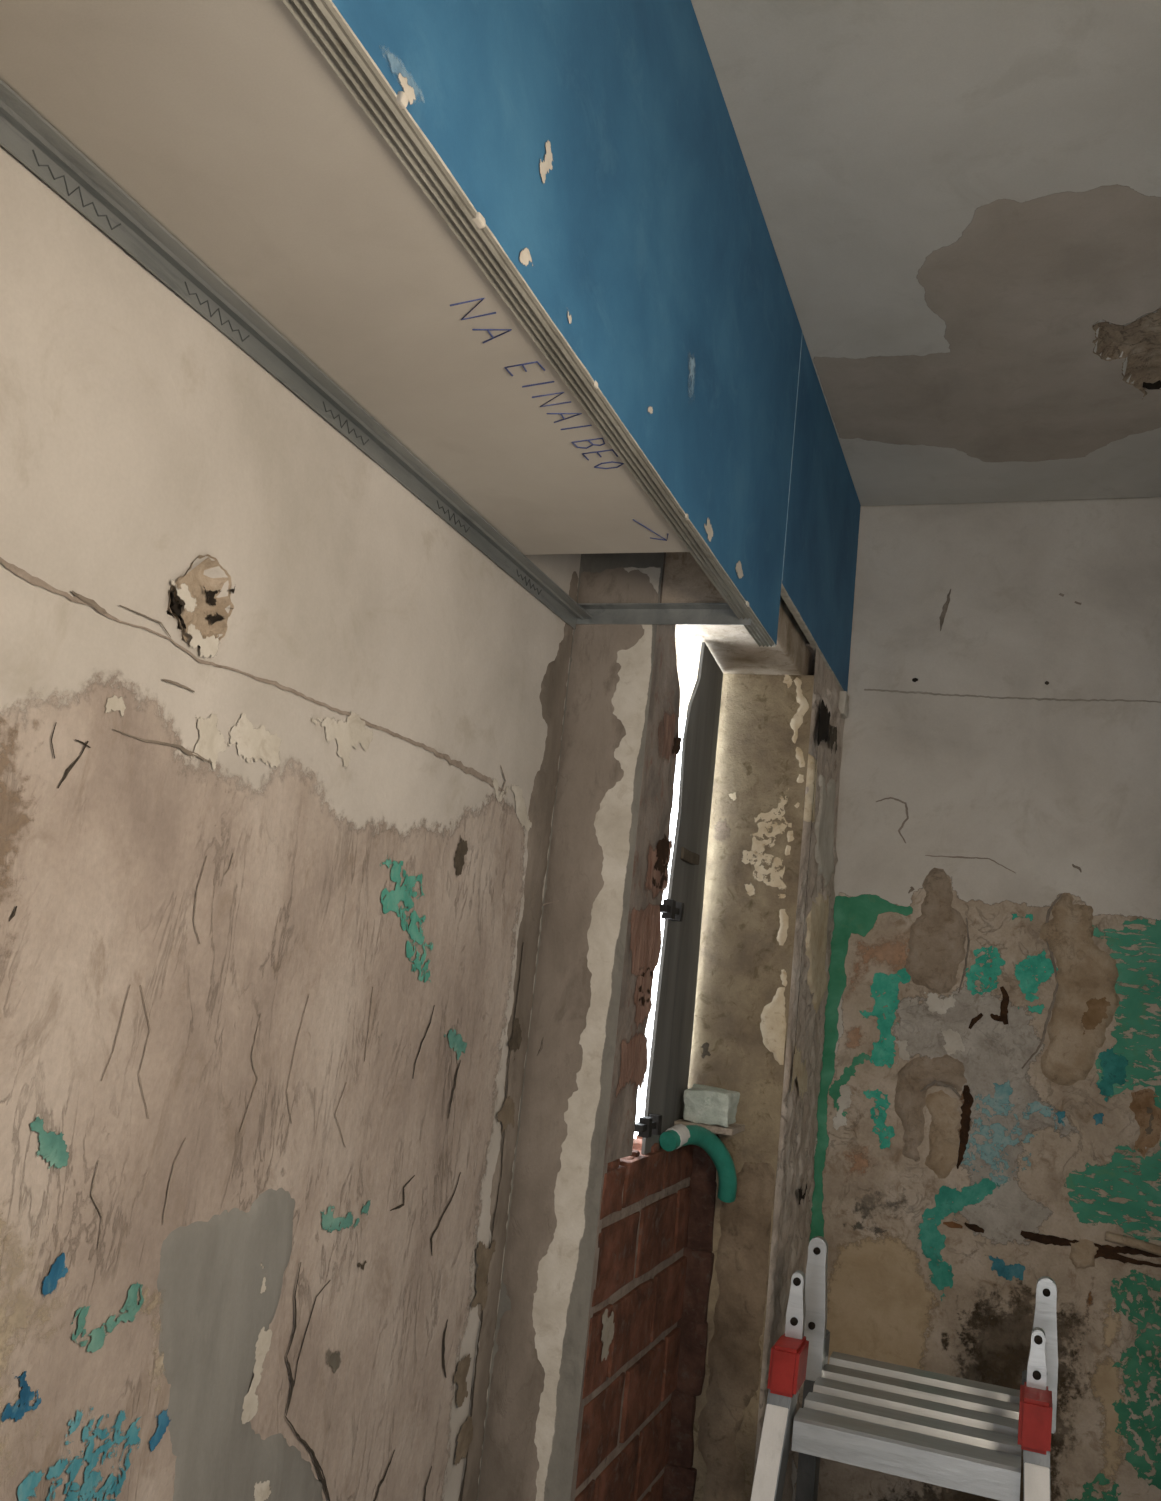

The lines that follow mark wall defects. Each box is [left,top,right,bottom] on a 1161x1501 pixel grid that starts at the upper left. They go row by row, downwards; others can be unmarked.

peeling [813,184,1161,462]
spalling [167,554,236,658]
crack [0,557,506,795]
flaking render [616,834,673,1097]
flaking render [0,675,532,1501]
spalling [741,675,1161,1501]
crack [285,1260,366,1501]
crack [424,942,544,1501]
damp [870,1480,1000,1501]
damp [942,1280,1036,1390]
damp [1050,1310,1085,1501]
crack [1094,1249,1161,1268]